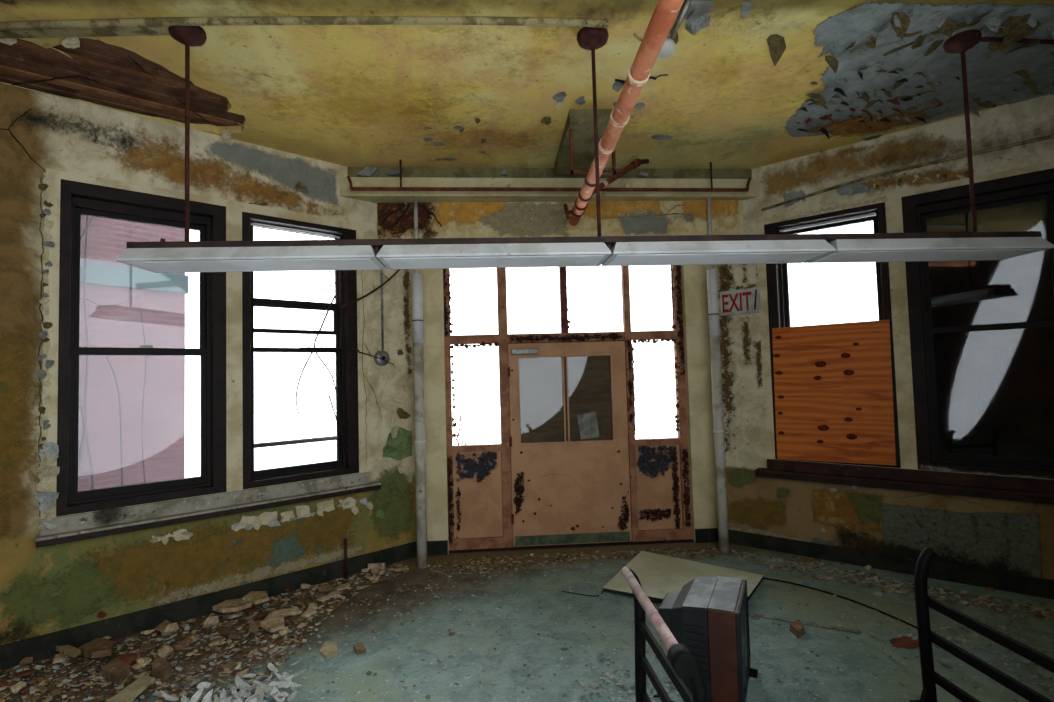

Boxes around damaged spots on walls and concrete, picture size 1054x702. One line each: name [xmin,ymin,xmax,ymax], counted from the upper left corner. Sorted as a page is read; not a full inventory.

spalling [0,37,338,204]
leakage [15,113,336,215]
peeling [540,92,586,125]
peeling [612,79,625,106]
leakage [762,136,946,195]
peeling [785,2,1054,141]
peeling [382,392,413,483]
leakage [91,501,355,605]